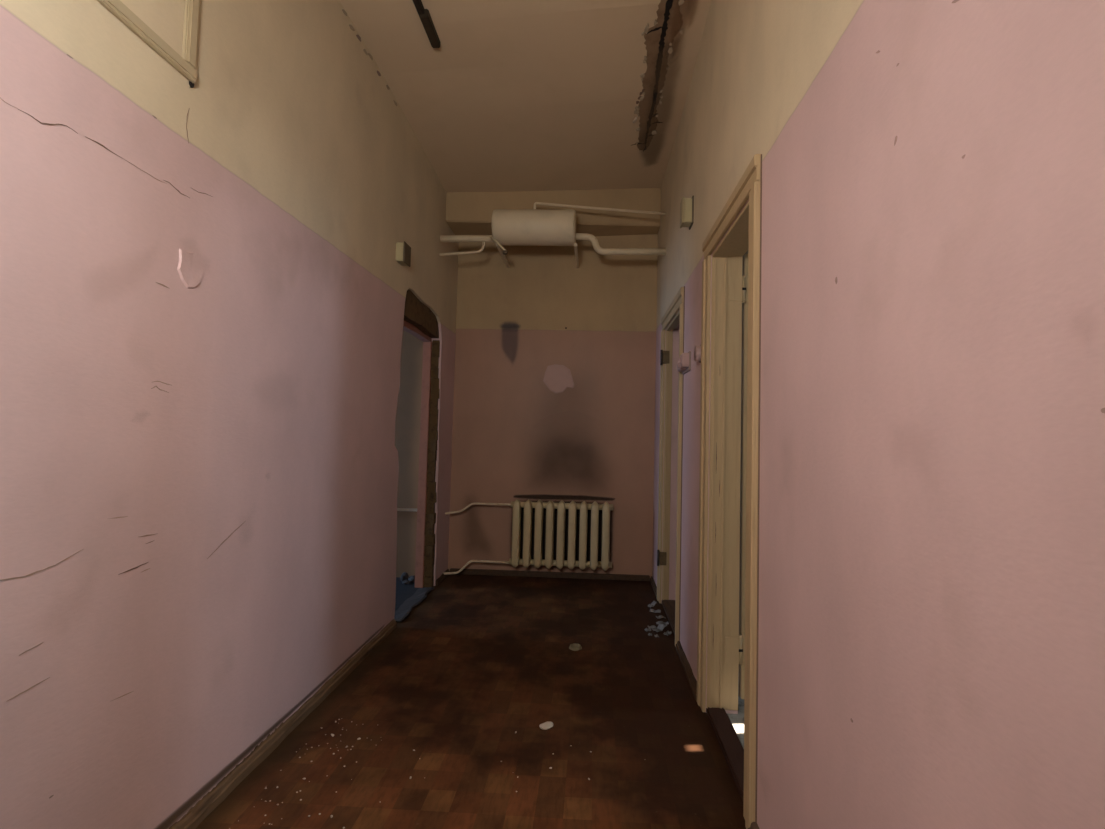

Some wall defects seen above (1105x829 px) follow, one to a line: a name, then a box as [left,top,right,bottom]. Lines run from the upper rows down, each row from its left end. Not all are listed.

crack [3,100,213,197]
peeling [633,0,685,150]